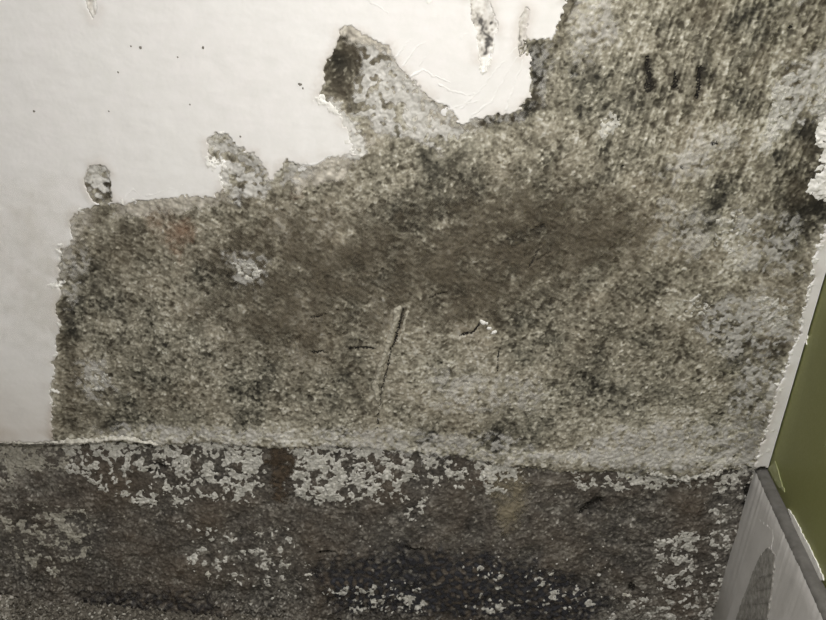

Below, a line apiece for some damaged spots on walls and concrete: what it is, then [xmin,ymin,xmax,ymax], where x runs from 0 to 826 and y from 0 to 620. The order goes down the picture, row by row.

damp [232,250,300,343]
damp [282,226,392,348]
flaking render [47,0,826,478]
damp [388,195,624,317]
crack [349,306,409,430]
damp [264,447,295,503]
spalling [0,435,754,620]
damp [315,546,609,620]